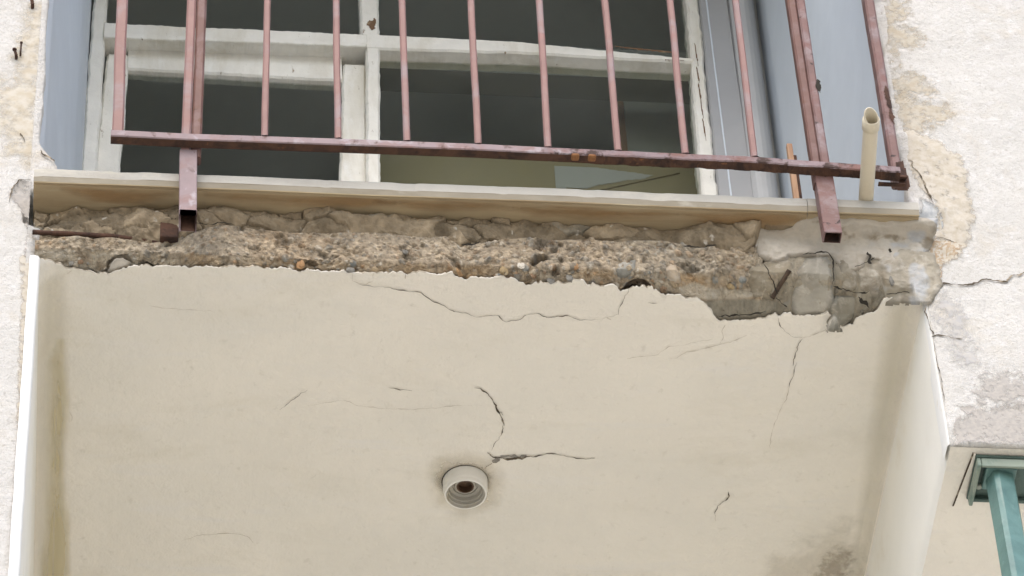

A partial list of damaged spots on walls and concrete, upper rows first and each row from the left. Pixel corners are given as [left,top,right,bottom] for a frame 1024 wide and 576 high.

spalling [9,0,976,426]
crack [352,273,629,322]
crack [943,272,1024,286]
crack [769,319,825,446]
crack [281,388,595,468]